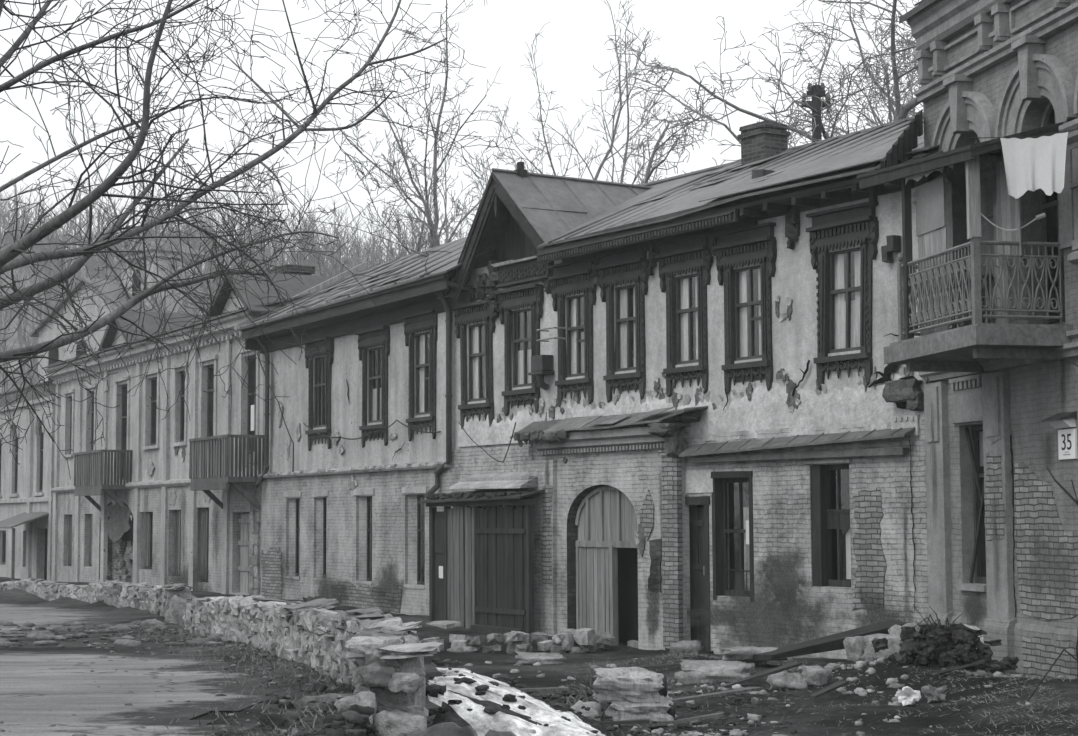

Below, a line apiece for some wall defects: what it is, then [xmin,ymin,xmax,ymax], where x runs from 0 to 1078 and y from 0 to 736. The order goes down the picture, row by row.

spalling [775,295,793,322]
peeling [458,366,932,447]
flaking render [634,490,662,592]
flaking render [852,487,887,609]
flaking render [984,435,1078,621]